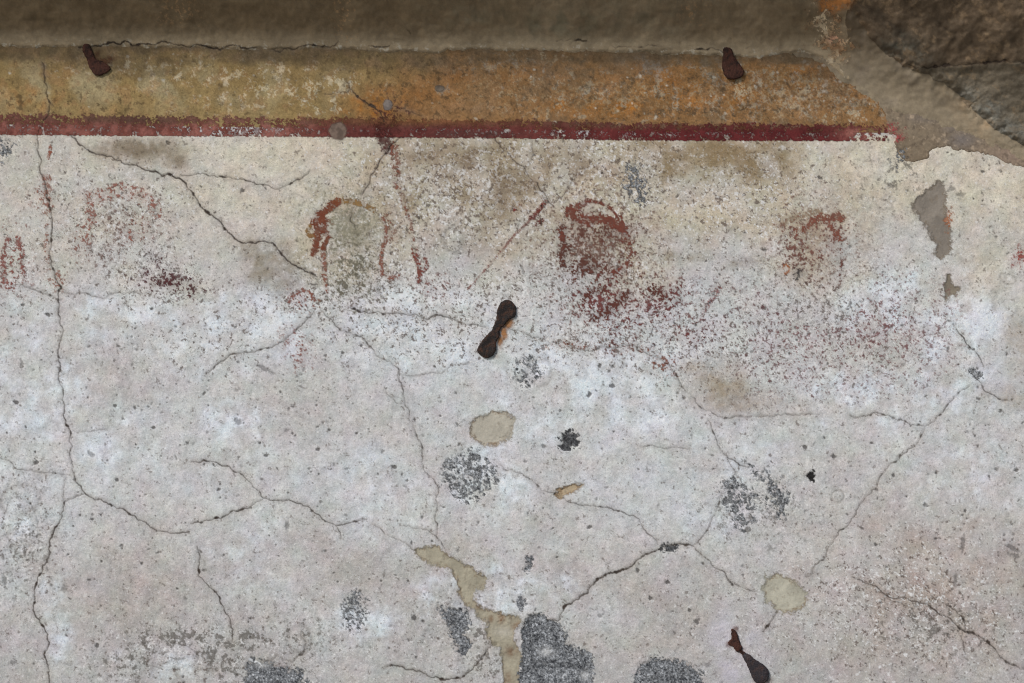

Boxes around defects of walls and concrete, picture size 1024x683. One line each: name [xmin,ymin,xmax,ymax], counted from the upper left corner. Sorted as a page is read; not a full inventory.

peeling [806,2,855,64]
flaking render [886,123,909,171]
crack [74,138,314,285]
crack [33,485,136,681]
crack [547,530,707,622]
crack [916,601,1014,665]